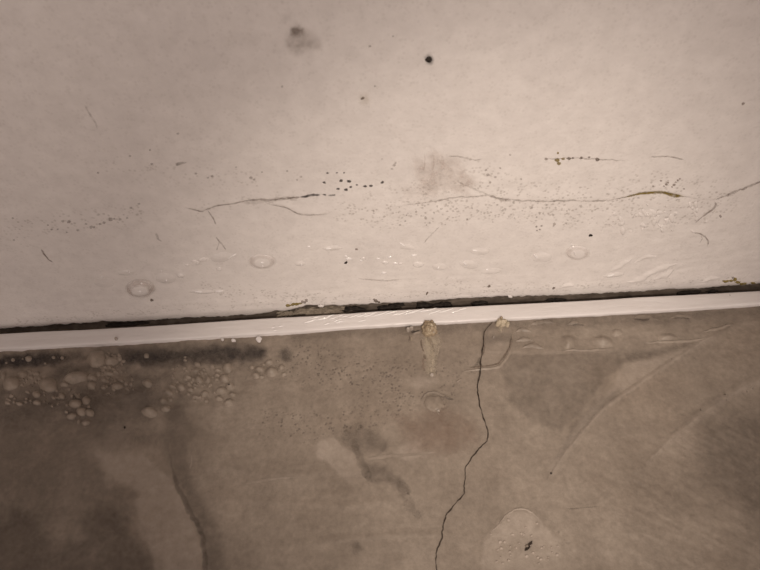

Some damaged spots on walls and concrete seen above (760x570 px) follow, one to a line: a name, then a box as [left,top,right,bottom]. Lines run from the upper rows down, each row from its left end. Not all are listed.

crack [628,190,680,198]
water stain [305,308,467,357]
water stain [0,353,61,368]
water stain [130,347,264,364]
crack [435,323,492,570]